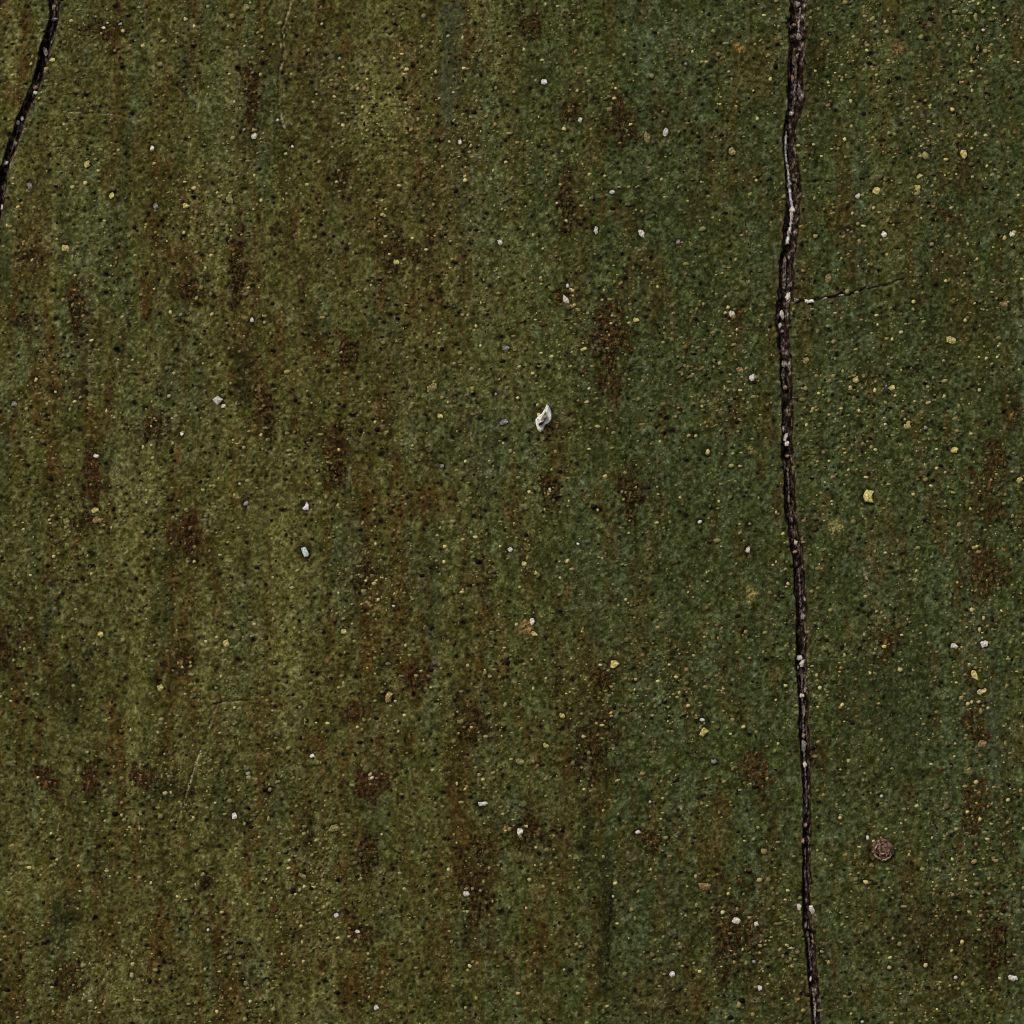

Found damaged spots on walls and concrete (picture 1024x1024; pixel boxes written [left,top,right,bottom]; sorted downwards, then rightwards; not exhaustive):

crack [0,0,60,218]
crack [775,0,900,1024]